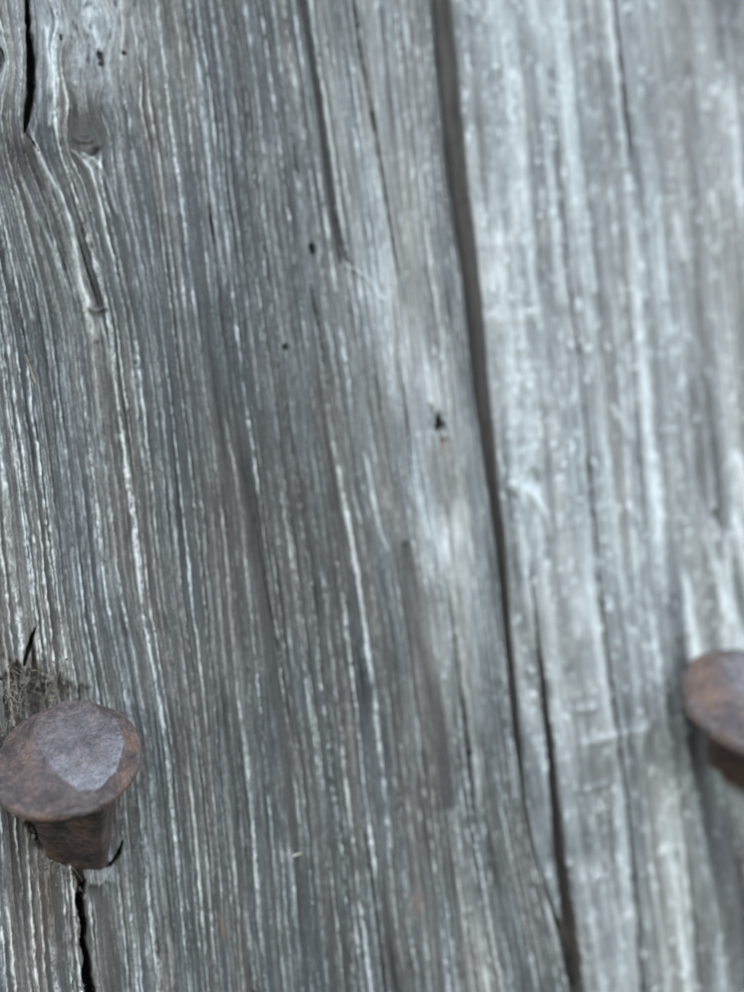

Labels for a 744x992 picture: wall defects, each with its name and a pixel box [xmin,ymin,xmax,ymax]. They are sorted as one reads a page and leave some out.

crack [0,0,39,152]
crack [78,236,101,313]
crack [106,841,123,867]
crack [75,874,95,992]